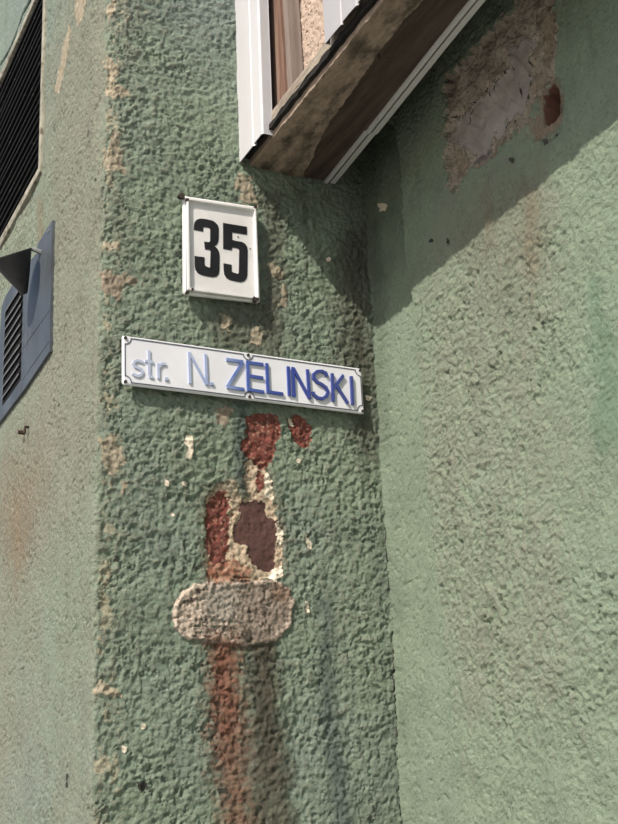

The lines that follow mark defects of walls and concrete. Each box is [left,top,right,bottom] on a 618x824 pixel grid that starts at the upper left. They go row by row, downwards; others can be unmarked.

peeling [54,0,86,96]
spalling [441,0,564,194]
peeling [172,413,312,648]